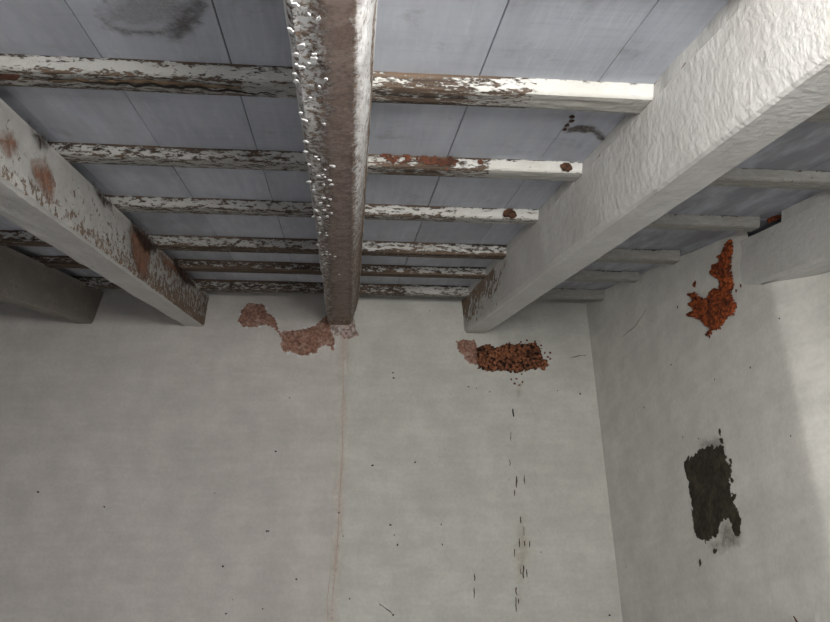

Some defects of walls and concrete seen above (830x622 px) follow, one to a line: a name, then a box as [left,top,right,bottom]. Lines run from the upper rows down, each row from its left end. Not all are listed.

peeling [0,74,276,96]
peeling [238,0,361,358]
peeling [380,154,459,171]
flaking render [677,239,742,338]
flaking render [456,339,551,386]